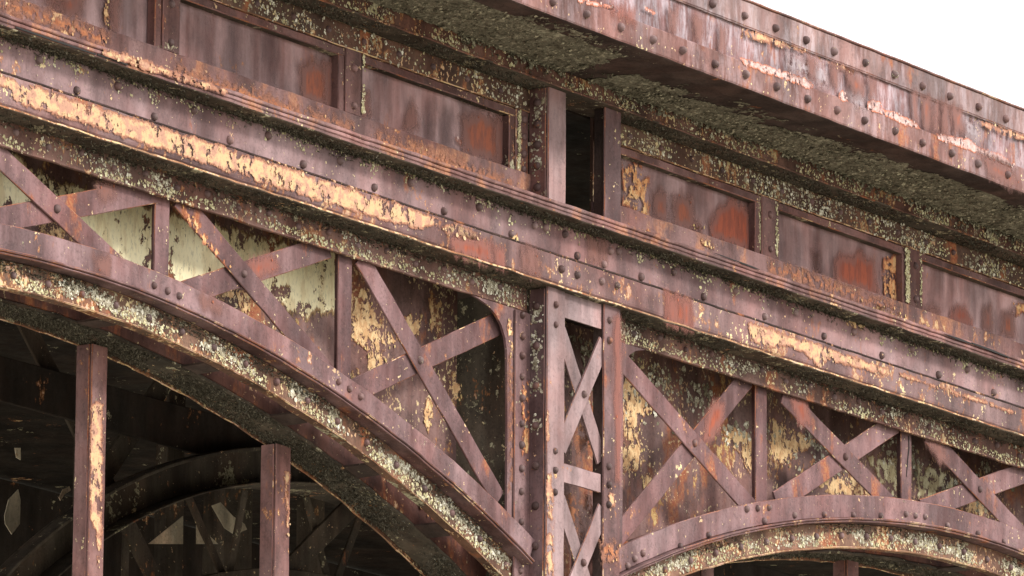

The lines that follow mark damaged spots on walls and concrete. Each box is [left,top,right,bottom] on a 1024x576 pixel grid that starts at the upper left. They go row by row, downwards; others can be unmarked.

peeling [102,48,228,96]
peeling [740,57,813,89]
peeling [0,73,481,242]
rust [376,101,519,186]
peeling [936,133,1015,168]
peeling [80,205,152,269]
rust [653,188,749,250]
rust [767,250,896,313]
peeling [351,287,398,379]
peeling [745,321,1016,414]
peeling [623,378,654,489]
peeling [89,397,104,568]